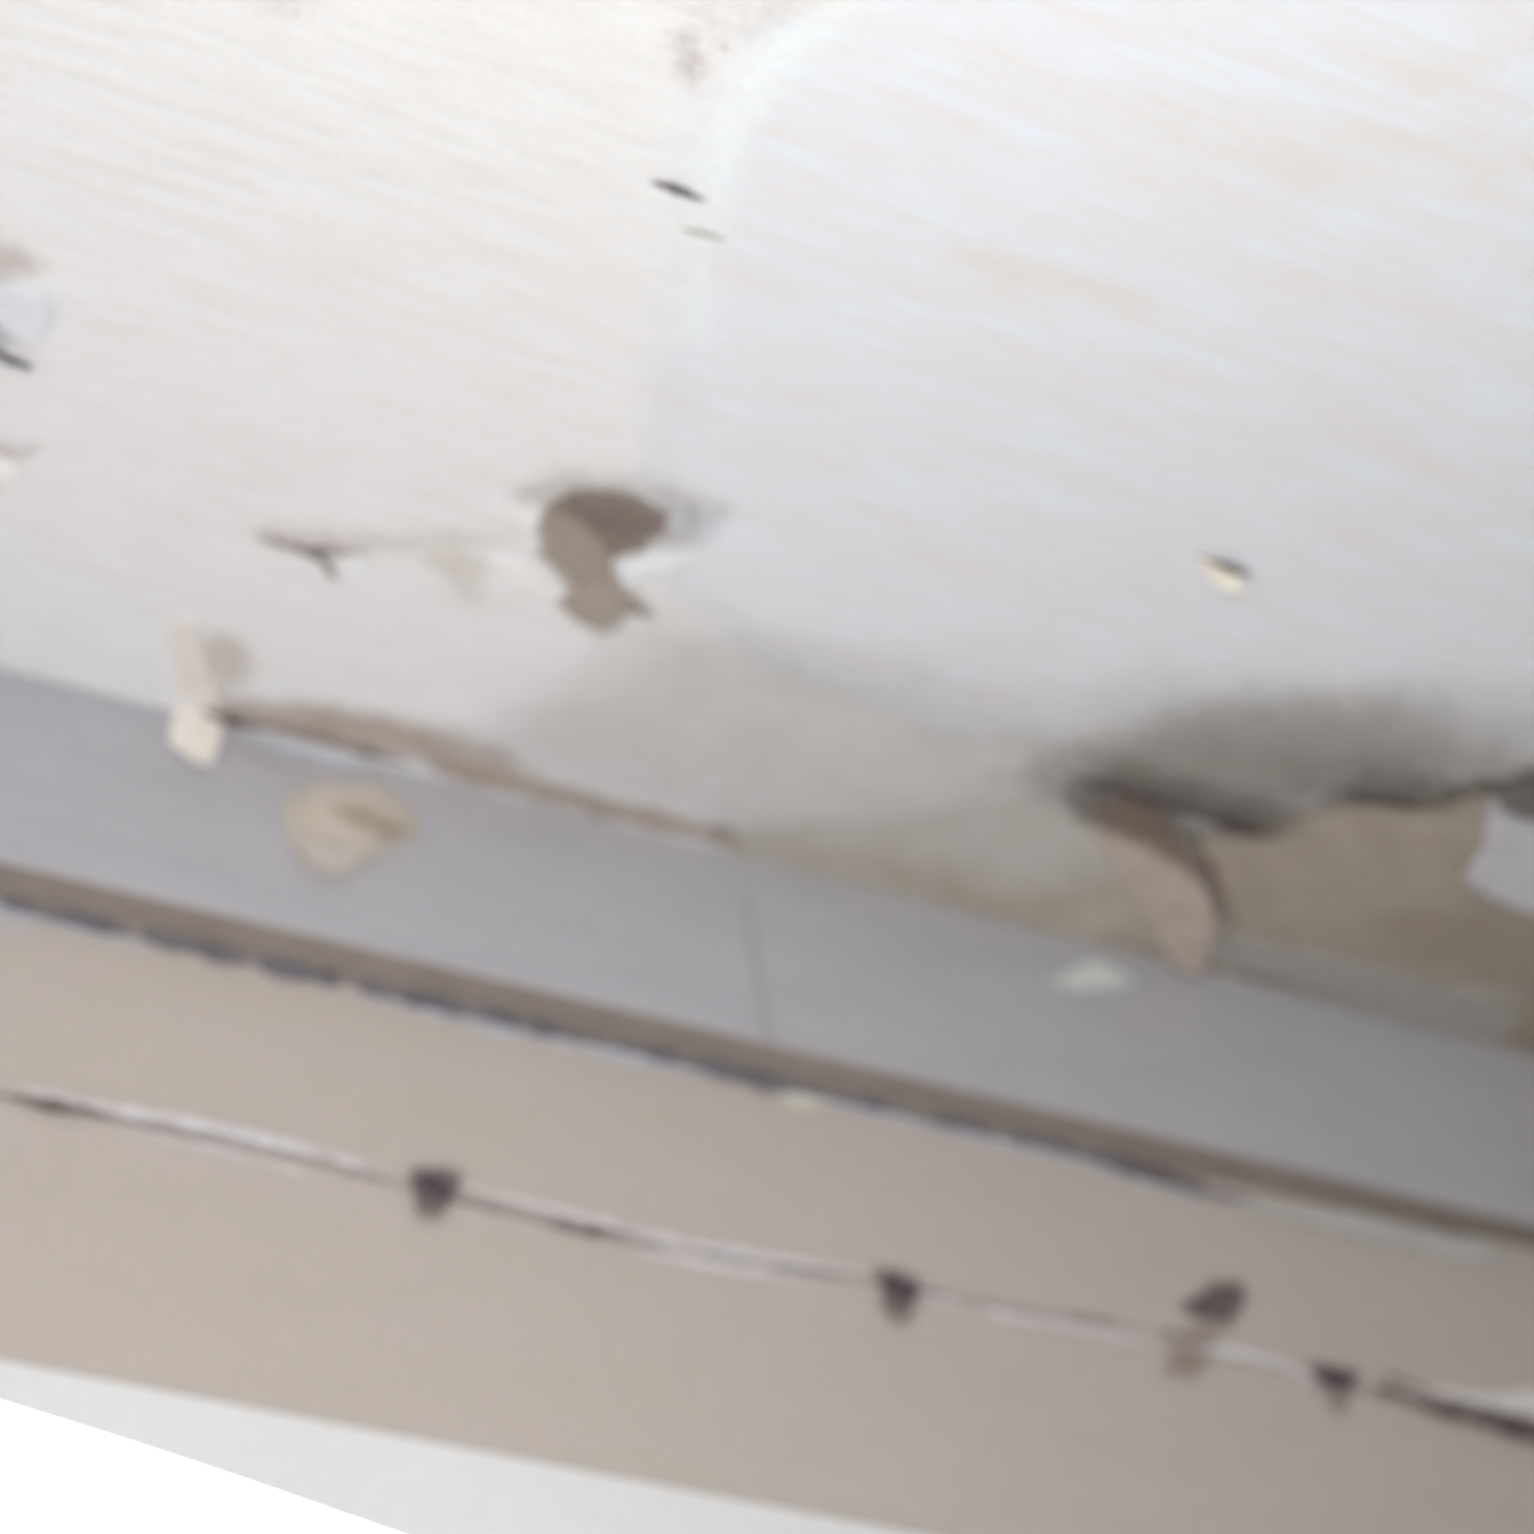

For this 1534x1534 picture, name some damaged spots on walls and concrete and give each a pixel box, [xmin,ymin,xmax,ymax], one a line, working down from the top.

peeling [0,233,56,371]
flaking render [489,455,747,639]
peeling [168,621,267,766]
damp [1049,959,1138,992]
peeling [1068,759,1534,1057]
peeling [1401,1388,1534,1421]